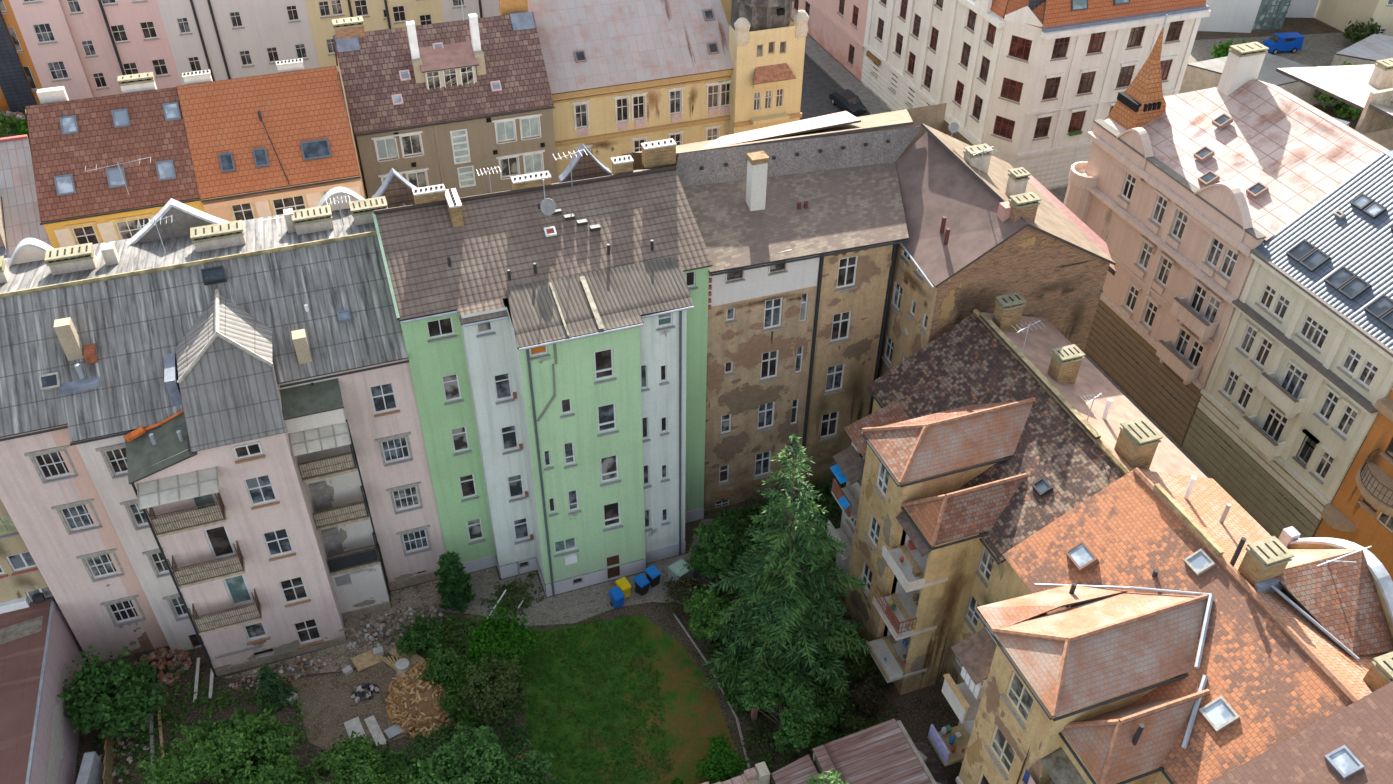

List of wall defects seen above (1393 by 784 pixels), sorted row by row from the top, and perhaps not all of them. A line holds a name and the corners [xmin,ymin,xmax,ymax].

flaking render [705,251,892,485]
flaking render [939,277,963,329]